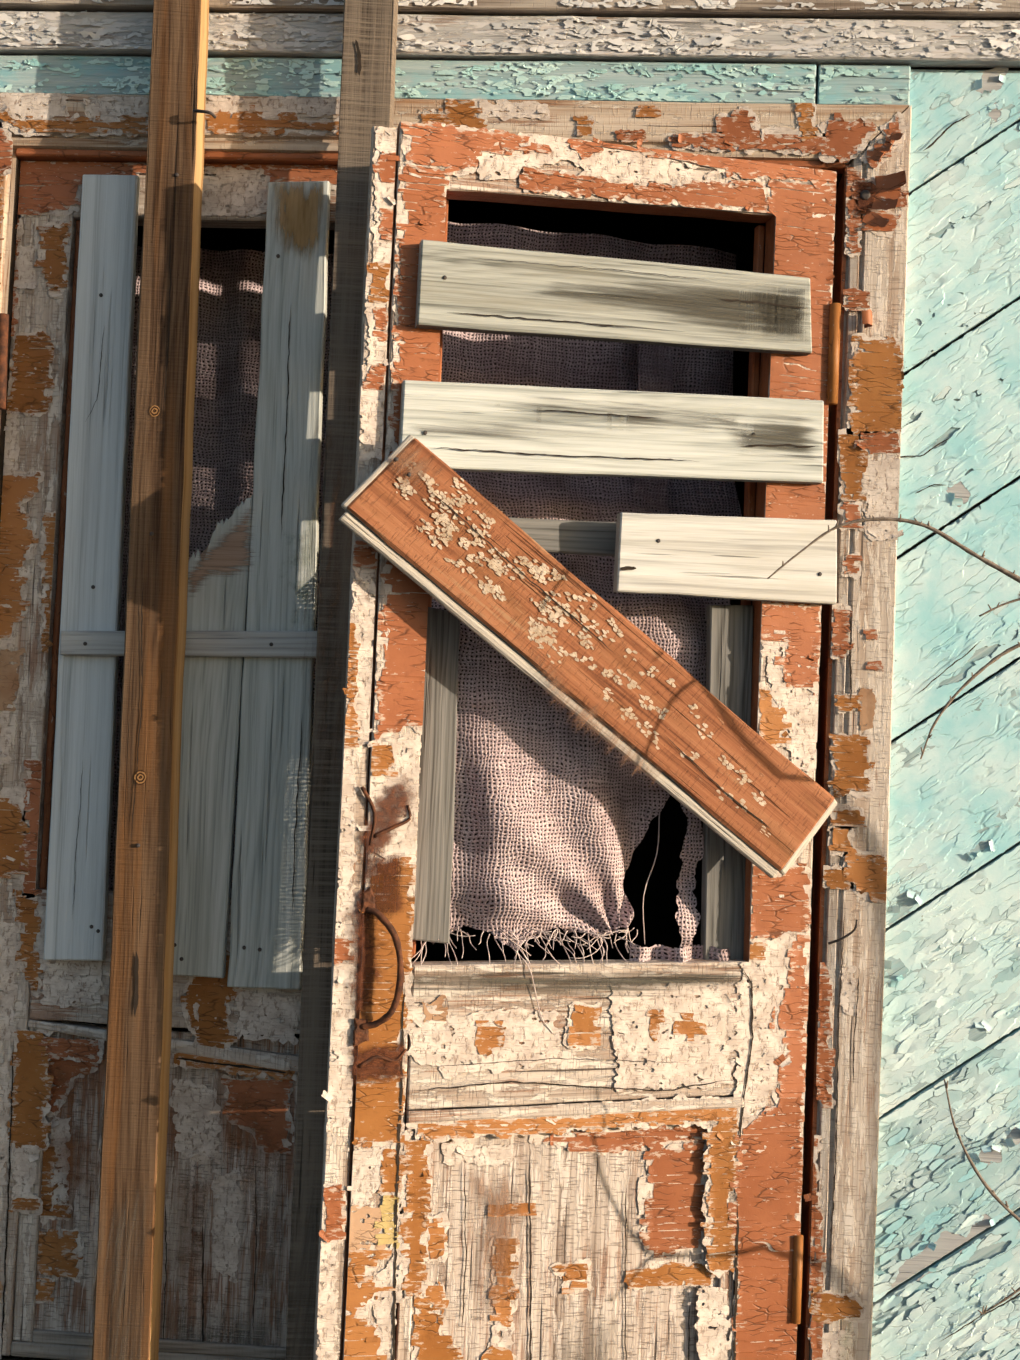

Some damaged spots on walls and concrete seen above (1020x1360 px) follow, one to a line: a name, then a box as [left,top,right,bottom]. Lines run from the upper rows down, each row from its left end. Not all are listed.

peeling [0,99,149,431]
peeling [360,98,910,538]
peeling [0,470,56,711]
peeling [343,539,428,778]
peeling [0,759,50,998]
peeling [7,1029,104,1304]
peeling [170,949,297,1157]
rust [351,782,413,1019]
peeling [319,601,924,1360]
peeling [887,1214,996,1290]
peeling [962,839,995,863]
peeling [972,1127,1020,1166]